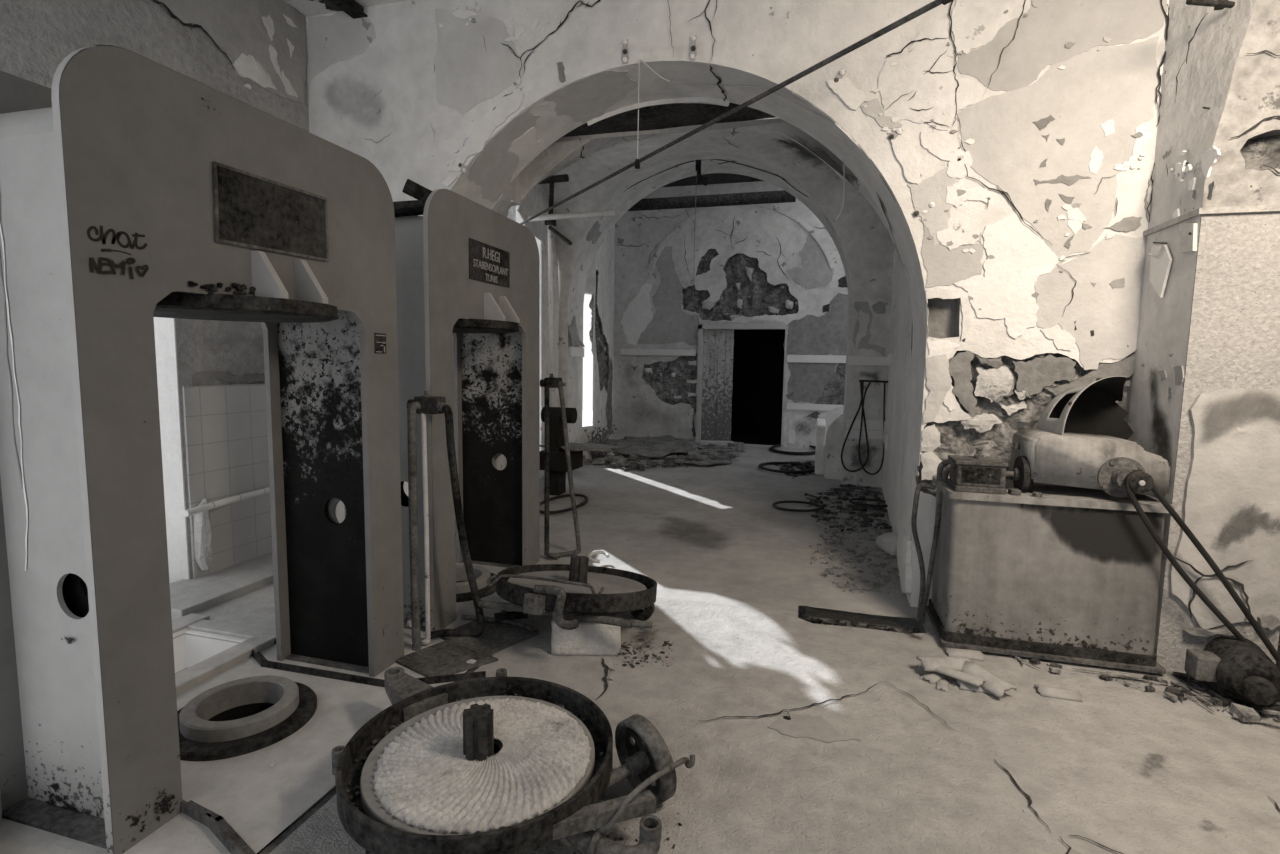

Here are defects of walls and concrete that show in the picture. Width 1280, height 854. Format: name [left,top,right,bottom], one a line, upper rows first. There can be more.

peeling [143,0,376,107]
crack [483,0,601,110]
crack [668,0,744,151]
crack [886,0,1090,317]
spalling [1240,130,1280,171]
peeling [827,0,1221,497]
spalling [568,271,610,393]
peeling [620,233,886,448]
leakage [1207,394,1280,437]
leakage [1219,506,1280,546]
crack [698,682,956,731]
crack [994,759,1124,854]